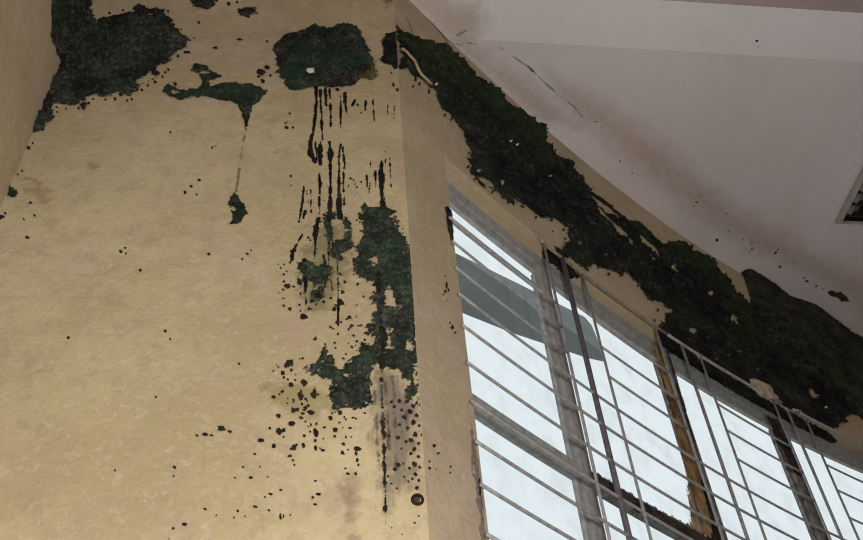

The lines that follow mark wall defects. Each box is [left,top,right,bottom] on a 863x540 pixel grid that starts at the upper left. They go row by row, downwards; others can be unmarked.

leakage [258,133,440,513]
leakage [445,206,454,244]